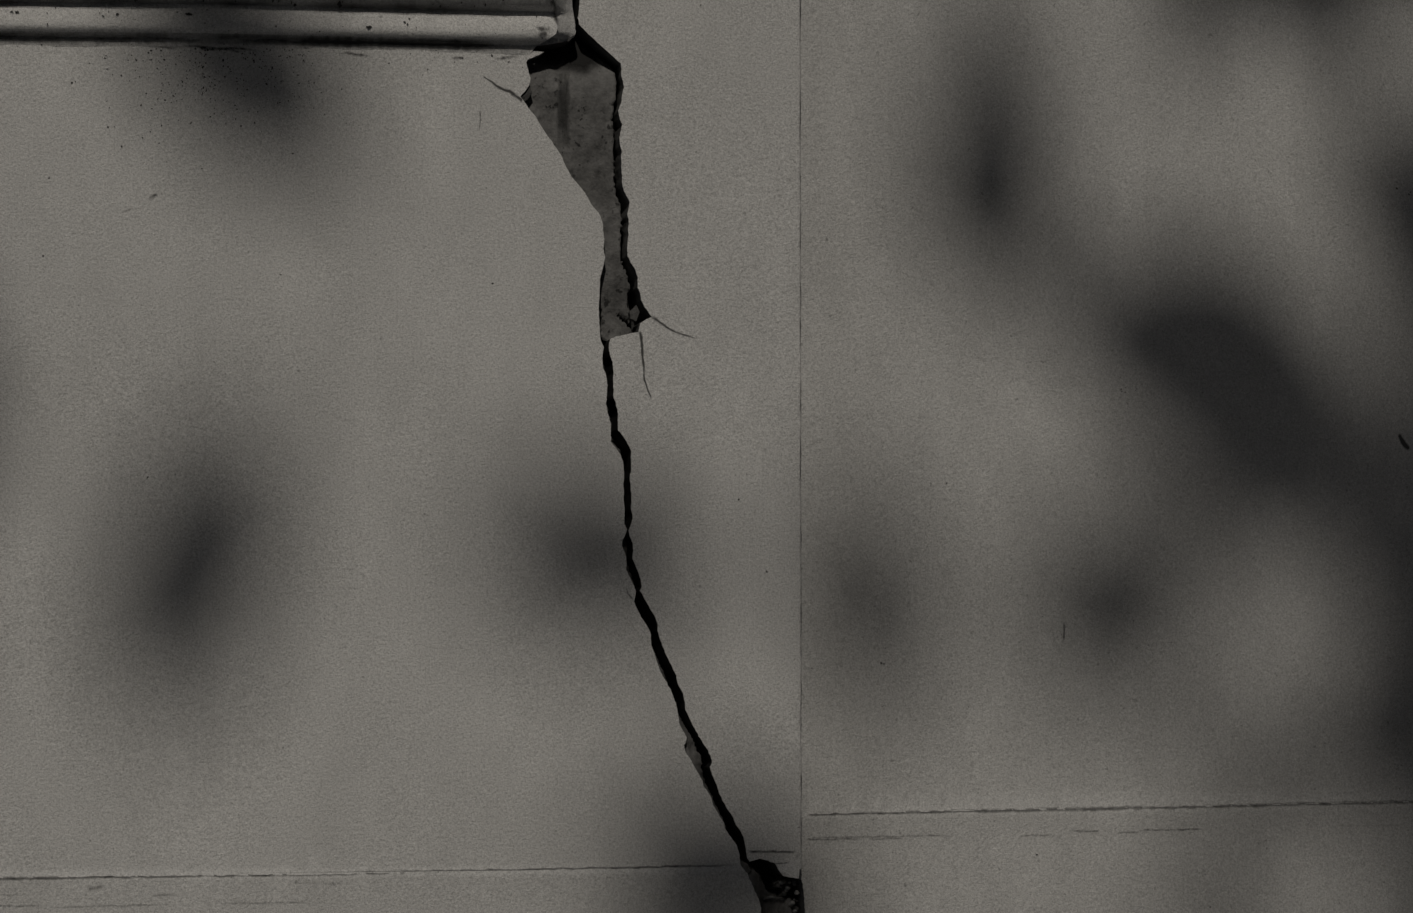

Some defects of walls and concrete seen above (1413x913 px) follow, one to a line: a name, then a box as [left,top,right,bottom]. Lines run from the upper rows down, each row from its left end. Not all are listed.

crack [572,0,580,28]
flaking render [484,24,691,397]
crack [370,338,792,873]
crack [0,873,287,881]
flaking render [740,859,805,913]